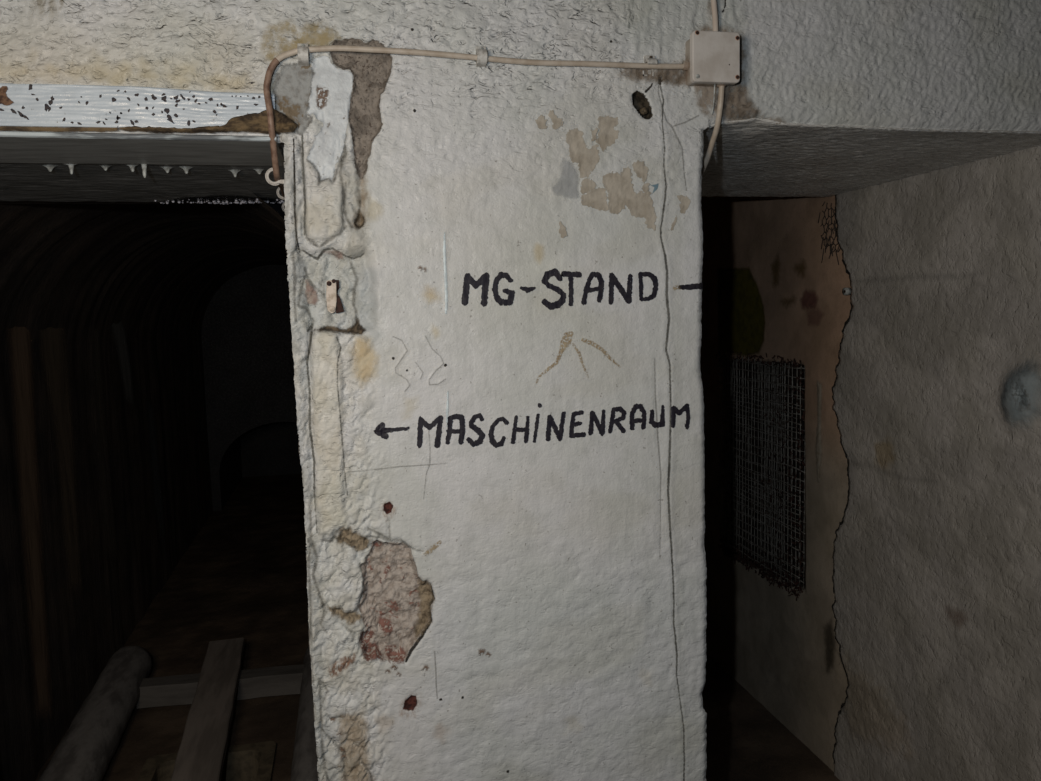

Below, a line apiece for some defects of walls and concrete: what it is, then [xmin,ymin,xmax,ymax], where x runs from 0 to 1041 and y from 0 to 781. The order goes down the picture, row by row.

spalling [29,84,82,125]
spalling [78,82,261,126]
flaking render [273,63,314,135]
spalling [330,38,392,224]
peeling [535,110,657,231]
spalling [329,528,435,662]